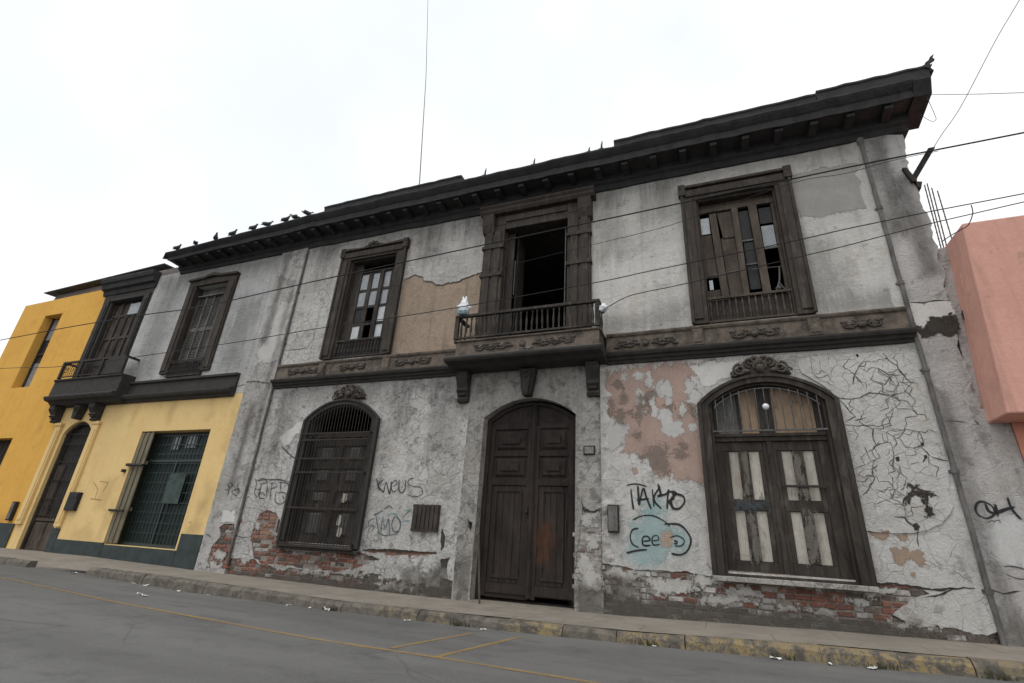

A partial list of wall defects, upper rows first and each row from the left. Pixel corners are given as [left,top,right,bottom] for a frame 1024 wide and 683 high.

flaking render [391,272,482,354]
peeling [909,299,965,339]
peeling [604,358,740,483]
crack [810,353,948,546]
flaking render [207,509,453,599]
flaking render [572,483,999,644]